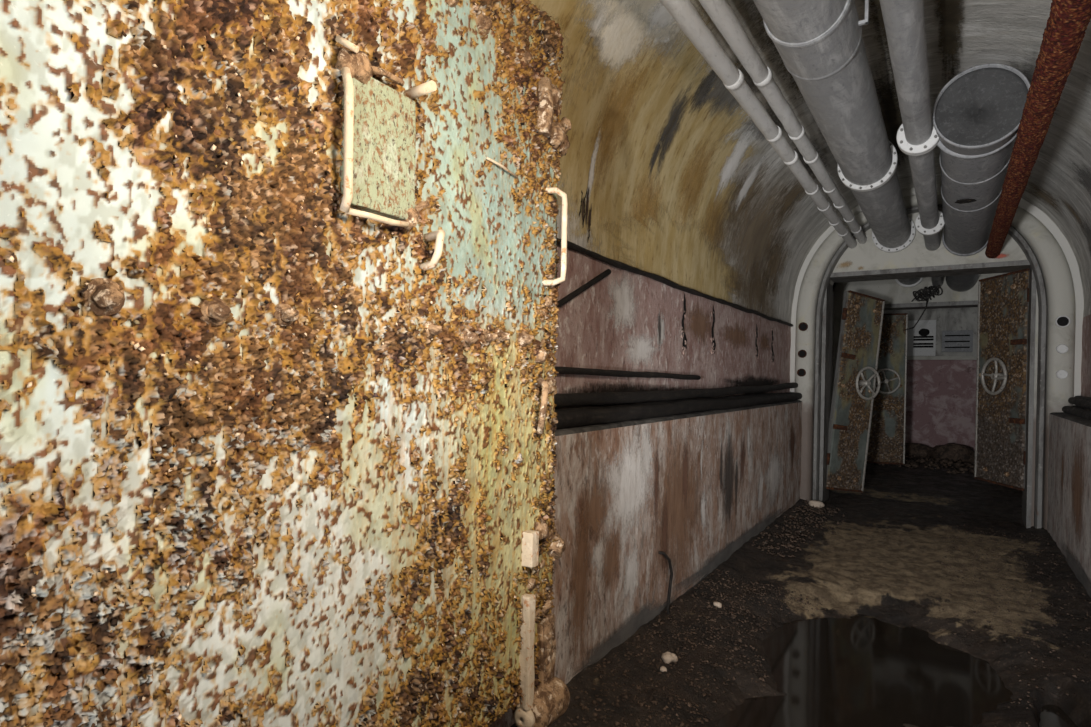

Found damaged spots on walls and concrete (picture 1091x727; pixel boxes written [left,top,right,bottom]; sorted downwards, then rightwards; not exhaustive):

water stain [529,0,804,317]
water stain [794,144,827,178]
corrosion [0,0,565,727]
water stain [611,278,665,365]
water stain [581,428,671,669]
water stain [720,439,738,519]
water stain [683,452,782,588]